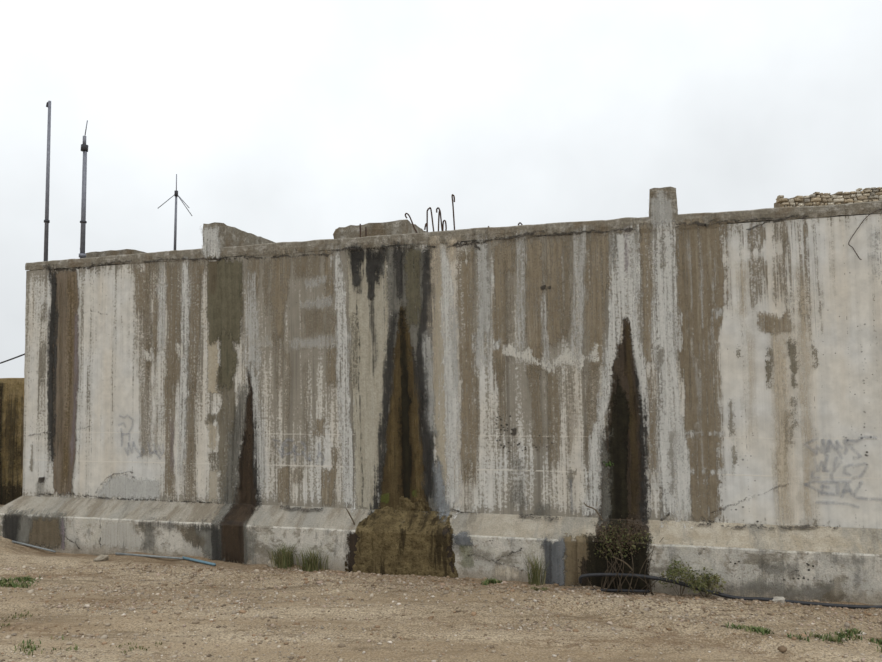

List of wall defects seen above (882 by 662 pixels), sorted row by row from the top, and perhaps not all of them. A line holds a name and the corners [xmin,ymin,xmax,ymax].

leakage [0,383,66,549]
leakage [184,226,265,564]
leakage [330,242,473,576]
leakage [472,191,693,592]